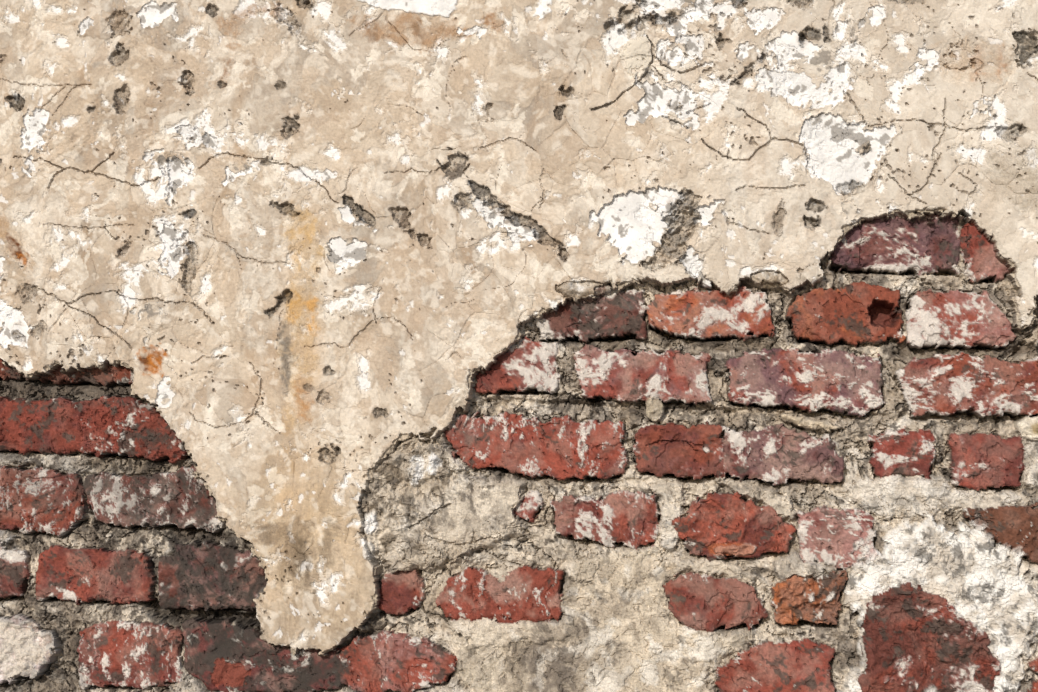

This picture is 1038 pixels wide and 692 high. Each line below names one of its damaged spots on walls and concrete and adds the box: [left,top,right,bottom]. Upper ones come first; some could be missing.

crack [637,41,703,84]
crack [14,151,162,188]
peeling [327,196,376,267]
spalling [437,151,570,263]
crack [662,106,810,191]
peeling [590,0,1038,336]
crack [843,90,995,197]
crack [33,285,217,350]
spalling [0,284,379,657]
spalling [362,295,598,570]
spalling [868,595,993,692]
leakage [837,513,1038,692]